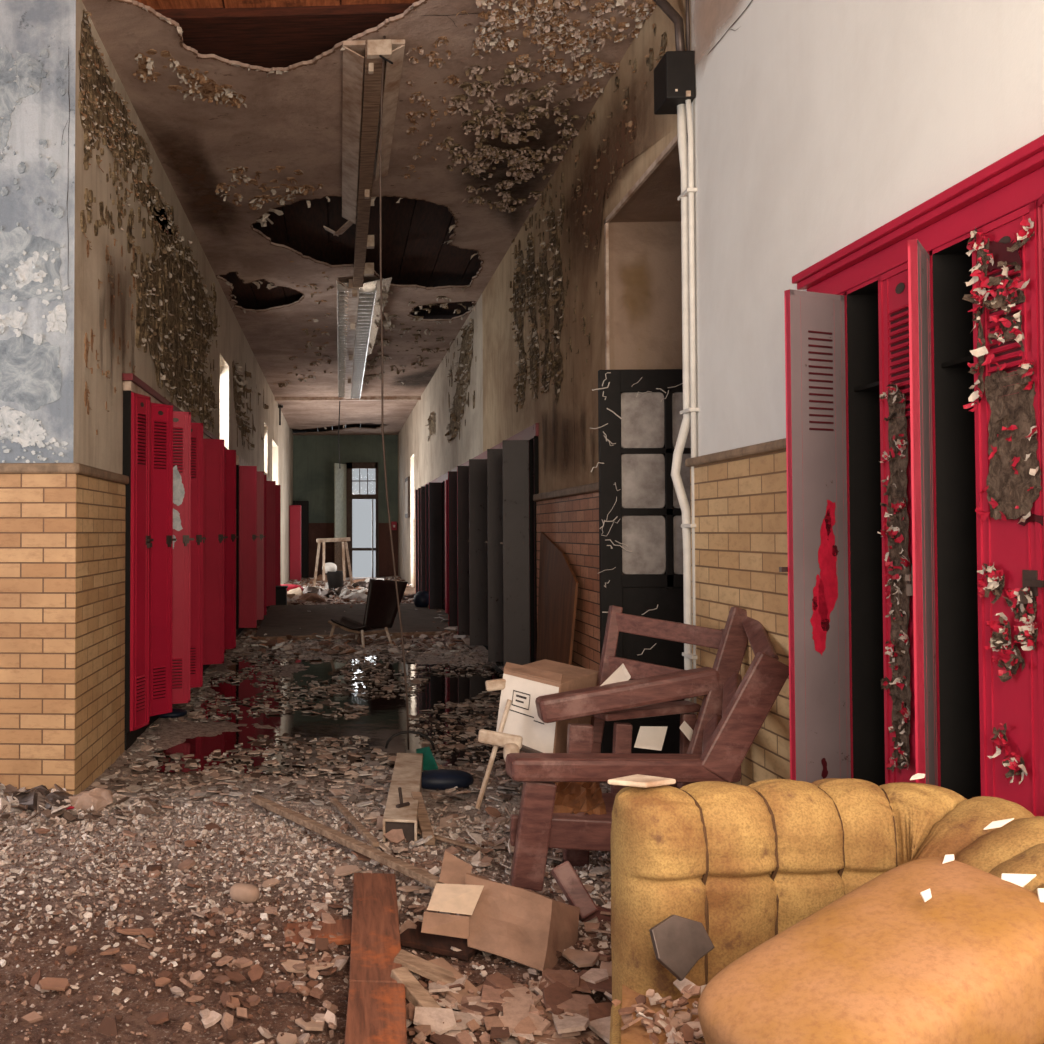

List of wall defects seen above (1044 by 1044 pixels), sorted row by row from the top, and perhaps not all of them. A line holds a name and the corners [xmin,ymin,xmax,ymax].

peeling [0,8,354,463]
peeling [107,0,428,108]
peeling [362,195,484,445]
peeling [402,0,668,412]
peeling [963,218,1042,524]
peeling [877,381,925,780]
peeling [987,723,1027,784]
peeling [977,563,1038,682]